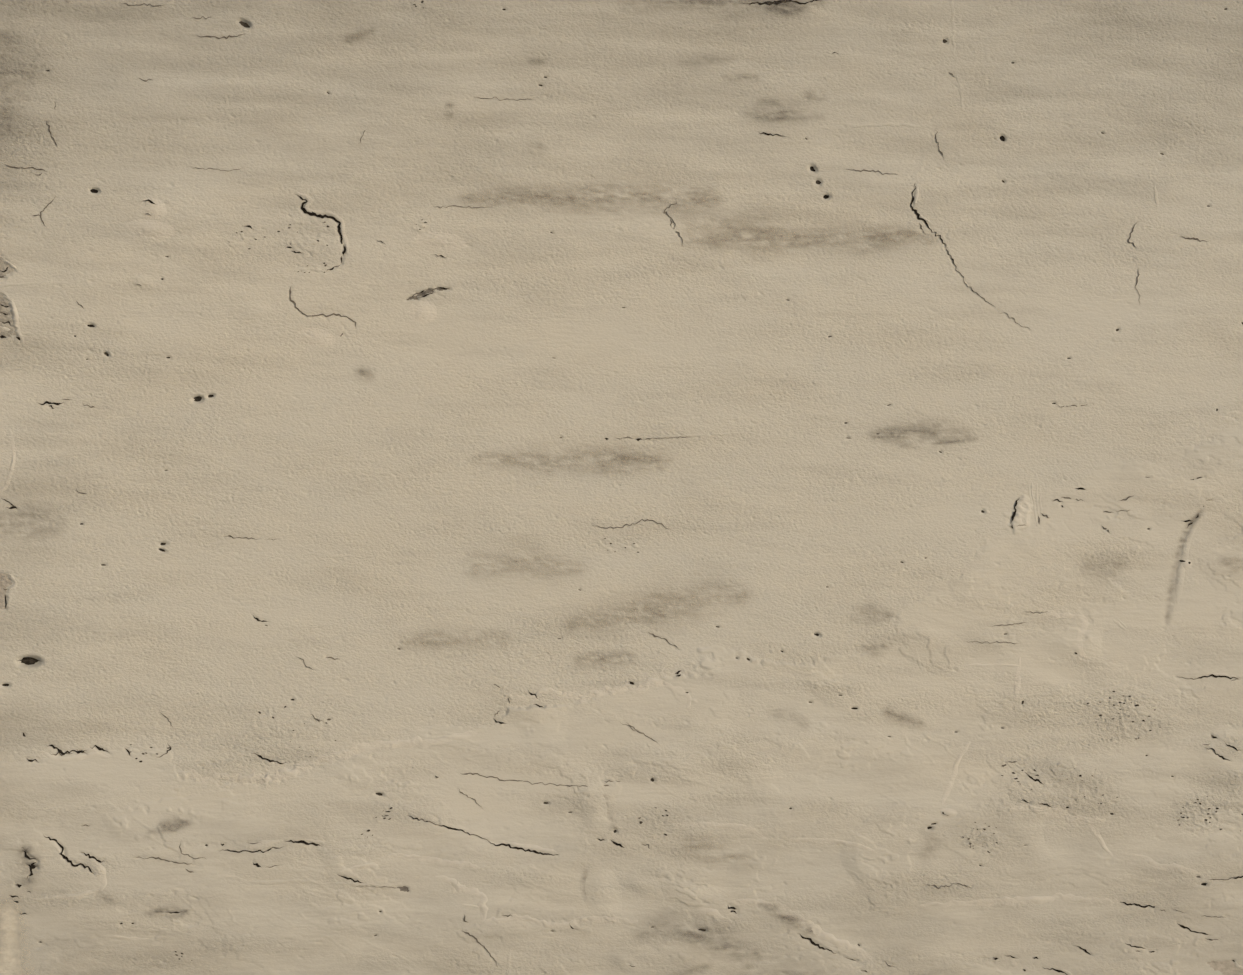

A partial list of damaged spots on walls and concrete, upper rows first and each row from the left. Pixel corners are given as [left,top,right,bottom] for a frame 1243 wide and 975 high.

crack [295,192,349,270]
crack [848,169,1030,329]
crack [289,287,356,337]
crack [383,773,620,856]
crack [9,825,107,915]
crack [136,839,324,873]
crack [337,863,394,888]